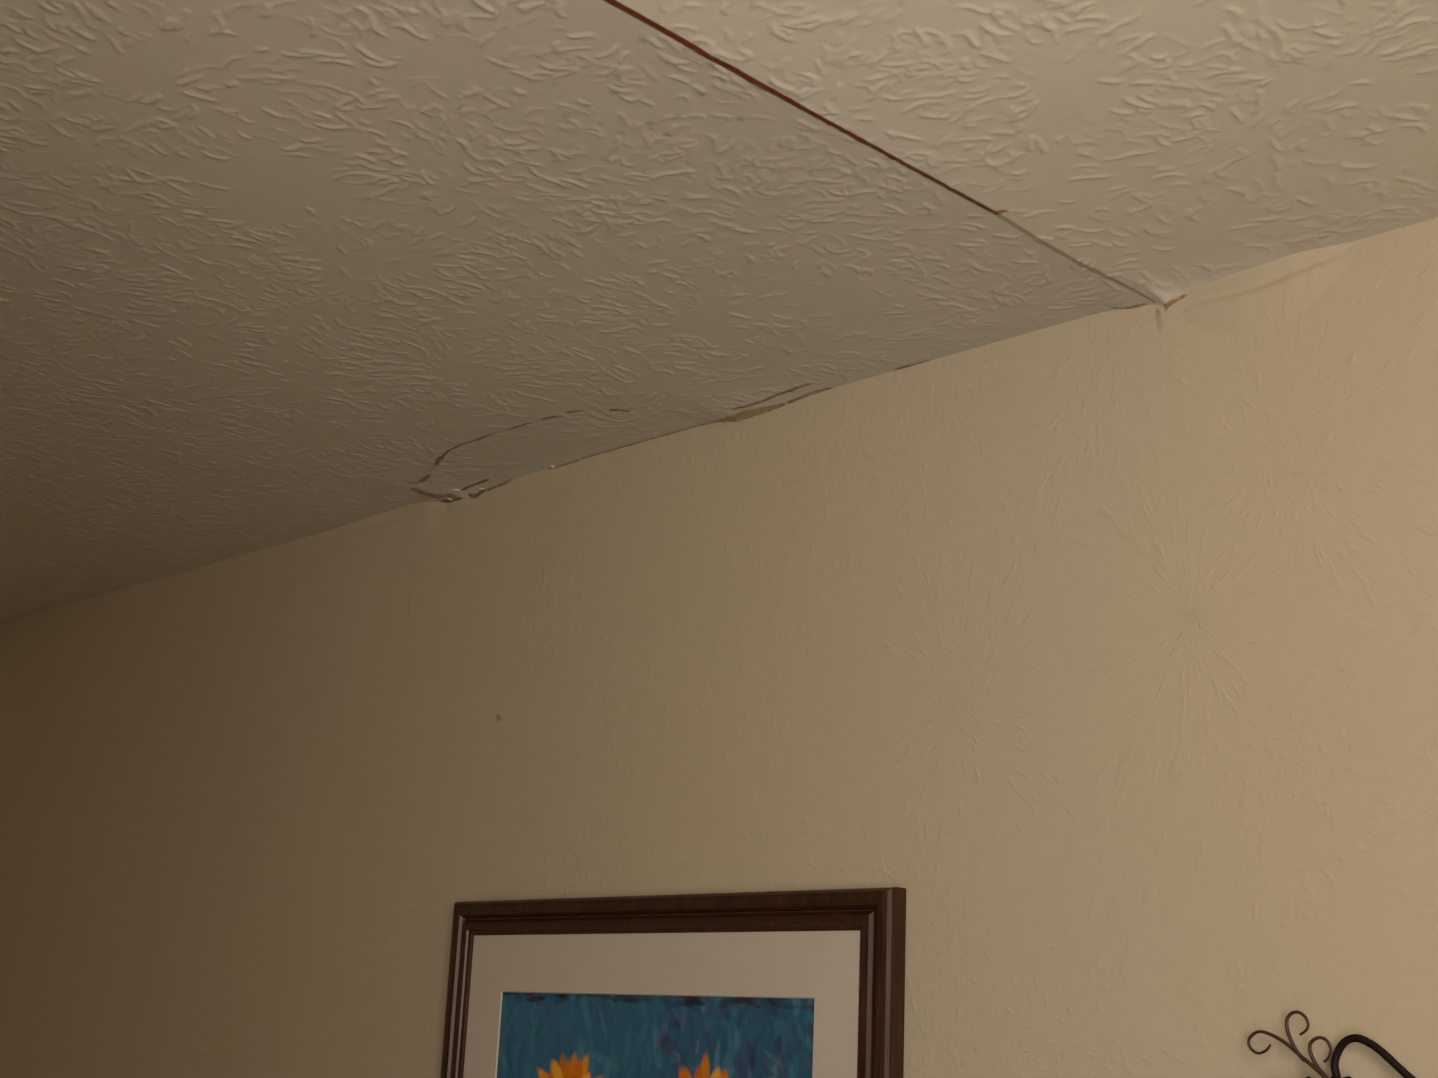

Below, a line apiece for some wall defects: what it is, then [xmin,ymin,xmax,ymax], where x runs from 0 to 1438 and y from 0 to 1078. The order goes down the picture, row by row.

crack [604,0,1185,309]
peeling [719,384,831,421]
crack [408,409,698,484]